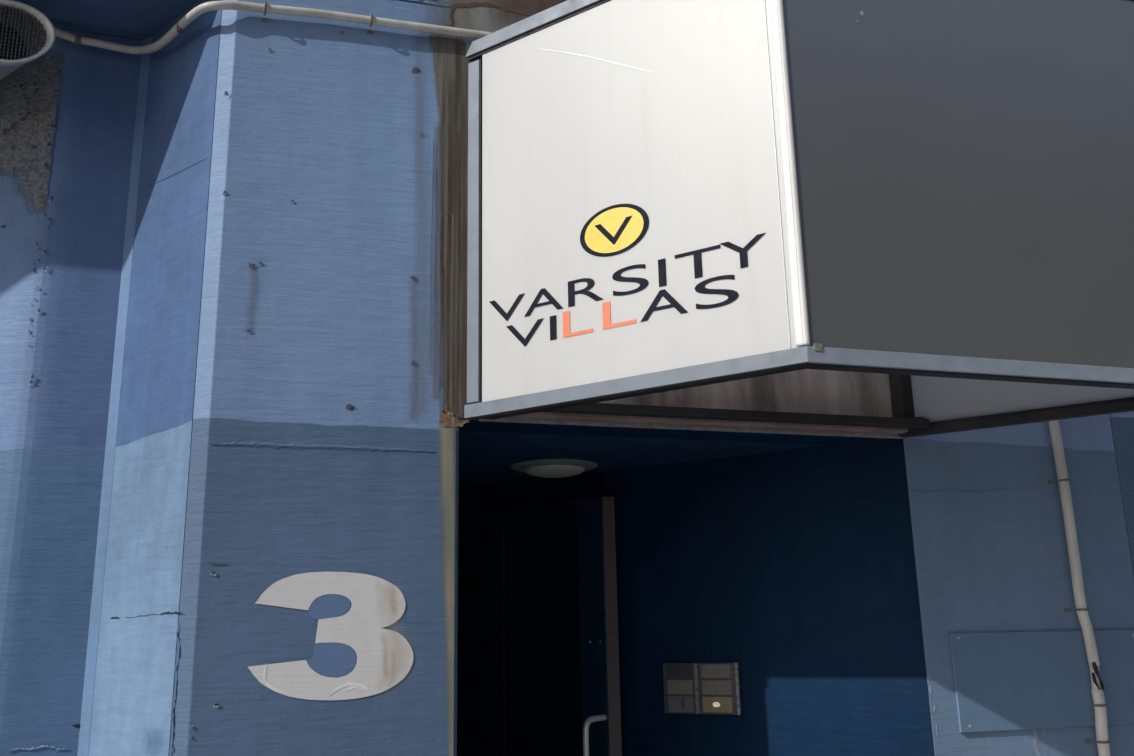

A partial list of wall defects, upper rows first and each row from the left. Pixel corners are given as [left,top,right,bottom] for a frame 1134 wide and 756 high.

spalling [0,51,63,211]
crack [111,612,182,756]